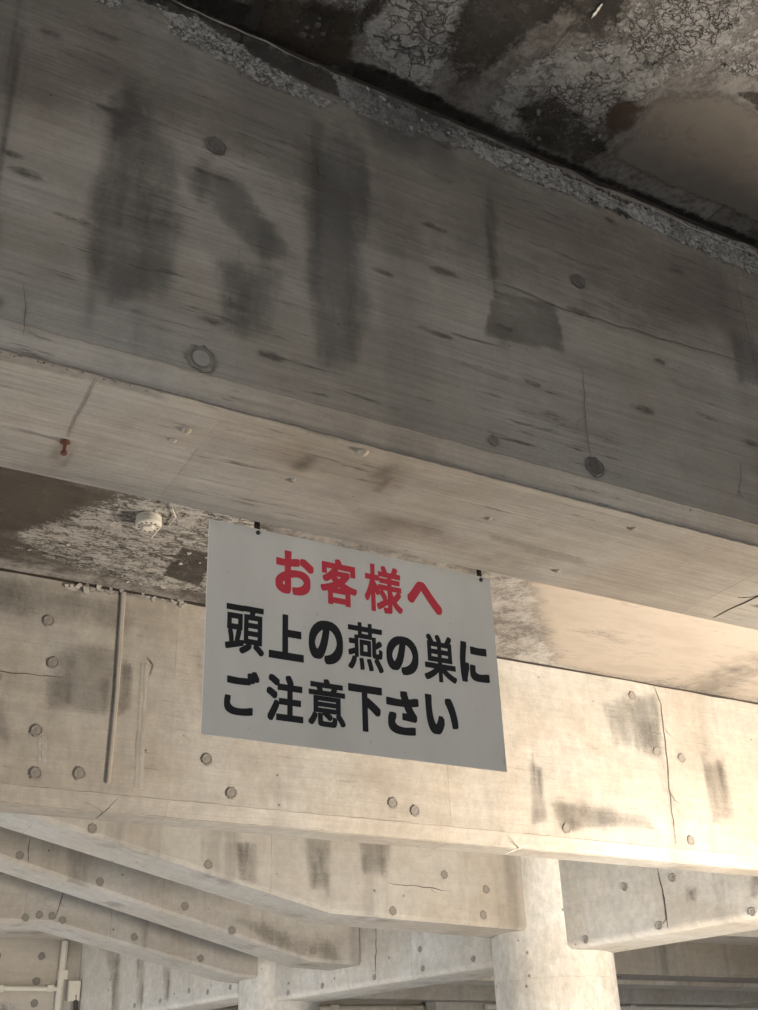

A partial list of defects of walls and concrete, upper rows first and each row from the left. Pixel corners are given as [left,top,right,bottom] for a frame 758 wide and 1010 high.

damp [138,0,758,247]
peeling [157,0,758,275]
crack [166,0,758,255]
crack [0,568,206,607]
damp [0,466,233,592]
crack [497,657,758,838]
crack [657,868,668,926]